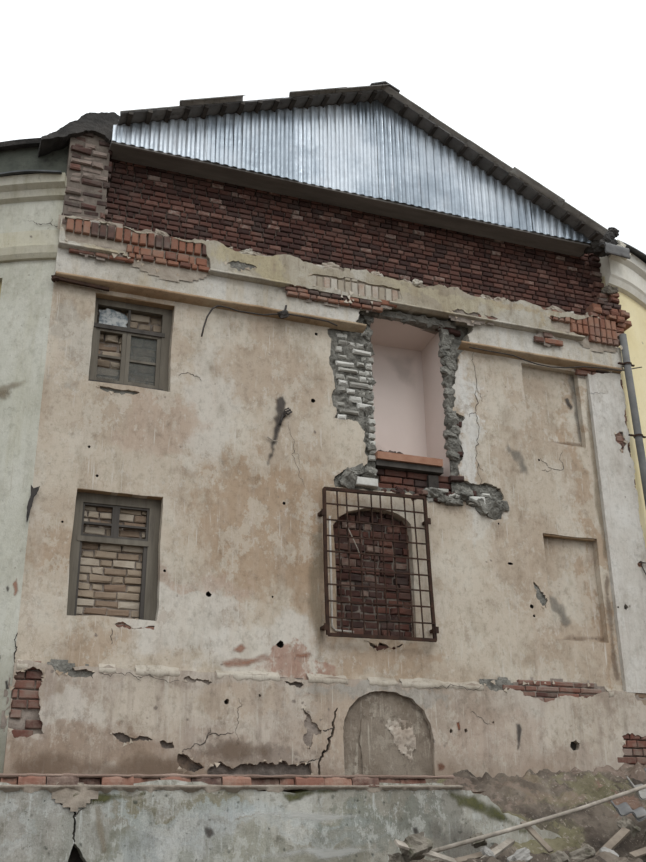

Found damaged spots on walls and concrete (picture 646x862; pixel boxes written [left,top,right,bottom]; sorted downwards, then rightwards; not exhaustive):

flaking render [57,215,210,282]
flaking render [223,261,256,272]
flaking render [533,293,632,353]
flaking render [281,268,509,525]
flaking render [0,659,95,738]
crack [182,698,241,752]
flaking render [110,733,314,775]
crack [300,710,336,774]
flaking render [479,677,605,702]
flaking render [617,733,646,766]